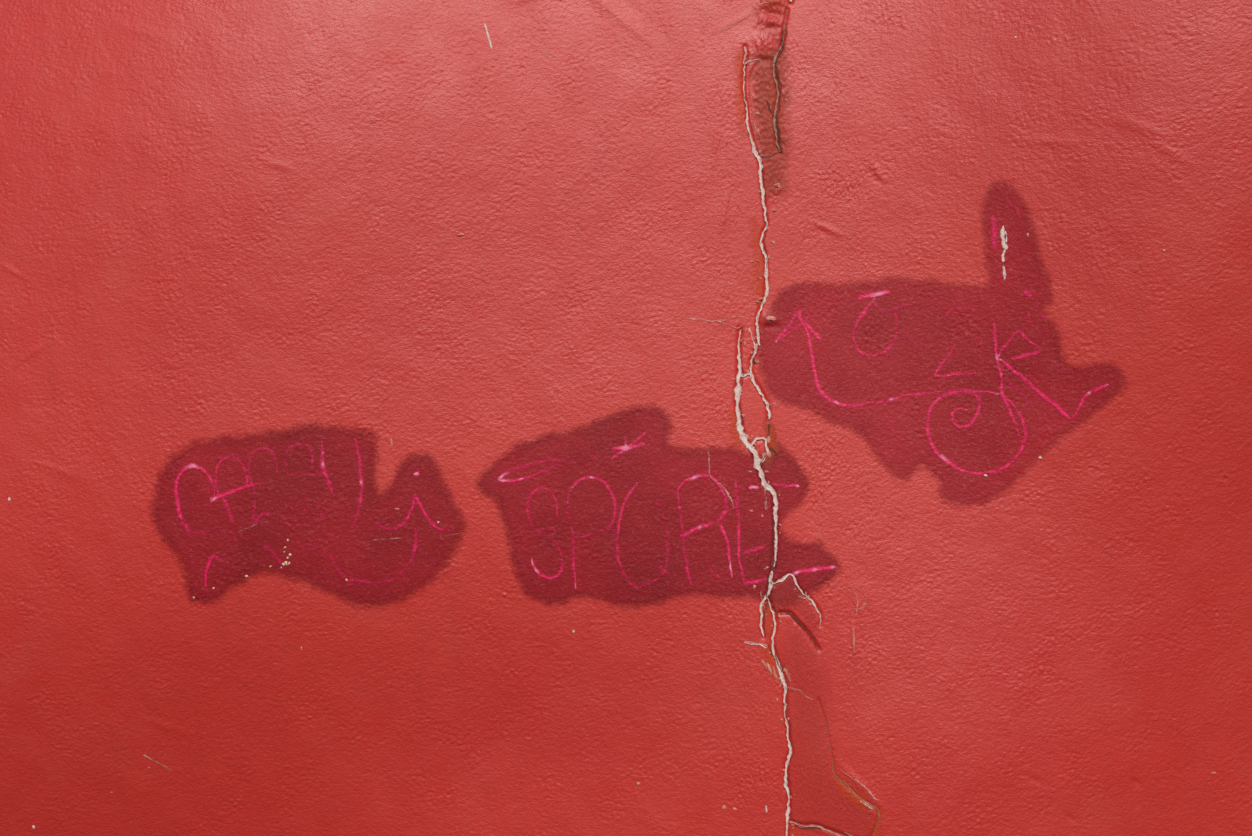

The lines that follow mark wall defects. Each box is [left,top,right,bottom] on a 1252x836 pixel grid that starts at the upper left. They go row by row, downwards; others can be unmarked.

crack [681,0,880,836]